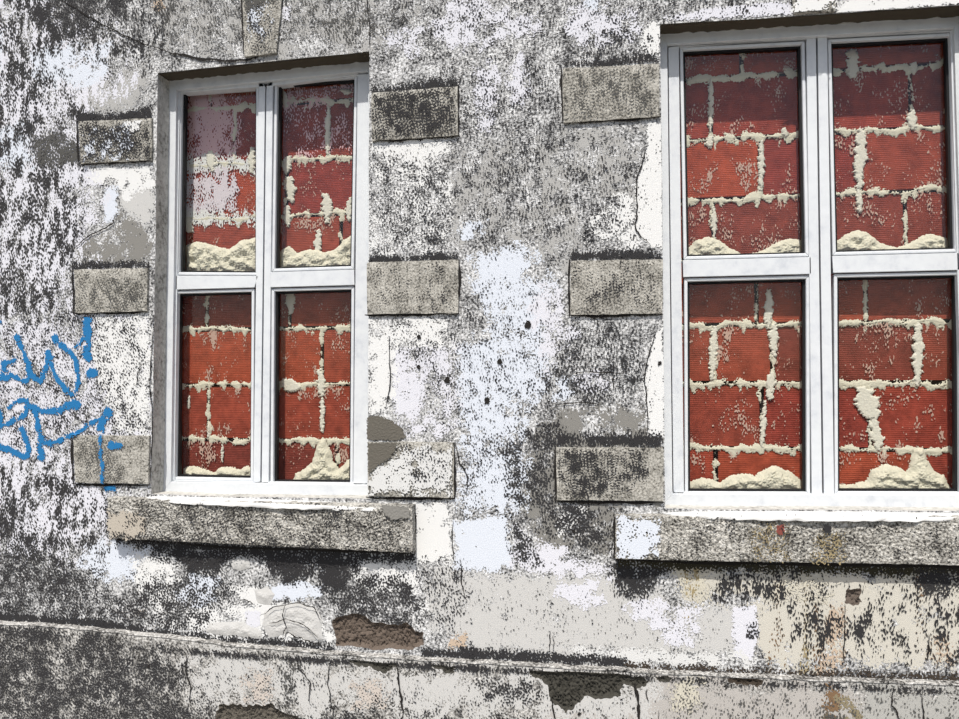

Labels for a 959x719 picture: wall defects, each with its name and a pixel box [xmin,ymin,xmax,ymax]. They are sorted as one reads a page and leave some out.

peeling [563,0,959,58]
flaking render [175,51,959,719]
crack [901,636,930,661]
crack [396,664,404,719]